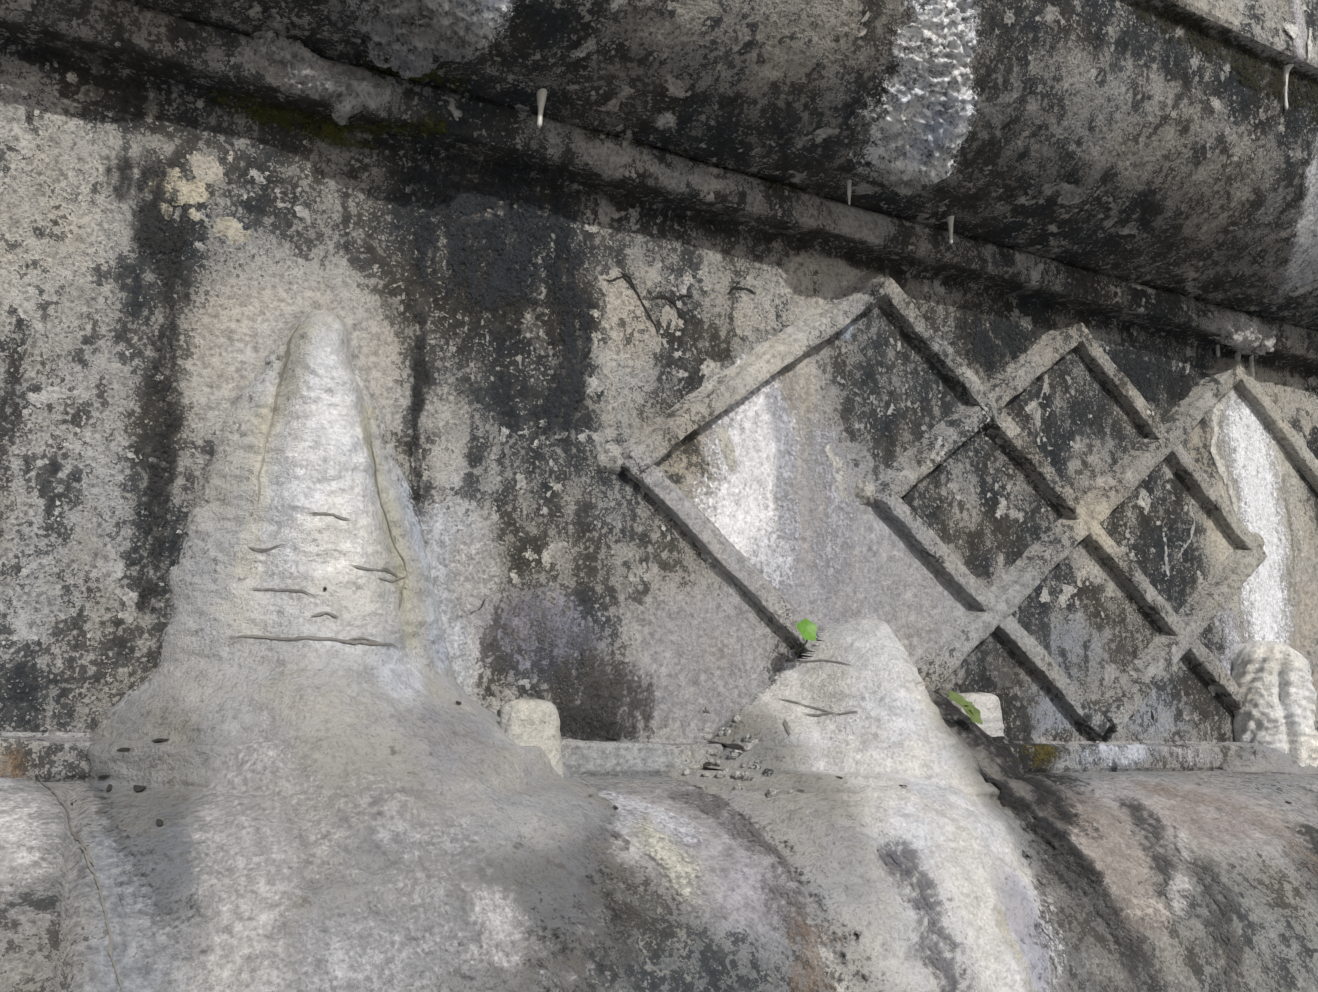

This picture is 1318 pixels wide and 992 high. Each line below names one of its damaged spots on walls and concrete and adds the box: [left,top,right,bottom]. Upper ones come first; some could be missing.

crack [258,324,299,502]
crack [247,543,286,551]
crack [232,588,399,648]
crack [309,512,349,520]
crack [350,434,408,610]
leakage [86,145,1242,992]
leakage [1081,386,1318,794]
leakage [1284,821,1318,854]